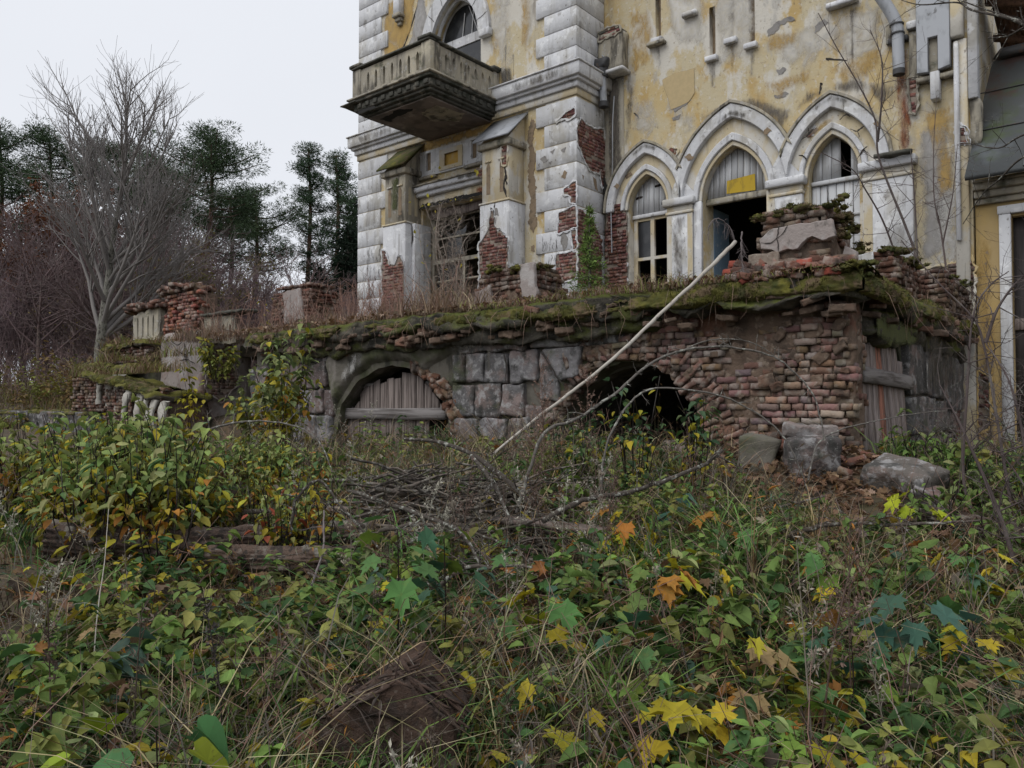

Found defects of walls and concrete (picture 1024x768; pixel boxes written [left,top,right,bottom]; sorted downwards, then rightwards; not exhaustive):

corrosion [898,70,910,147]
flaking render [527,105,629,292]
flaking render [380,249,406,315]
flaking render [477,207,510,287]
flaking render [600,301,869,451]